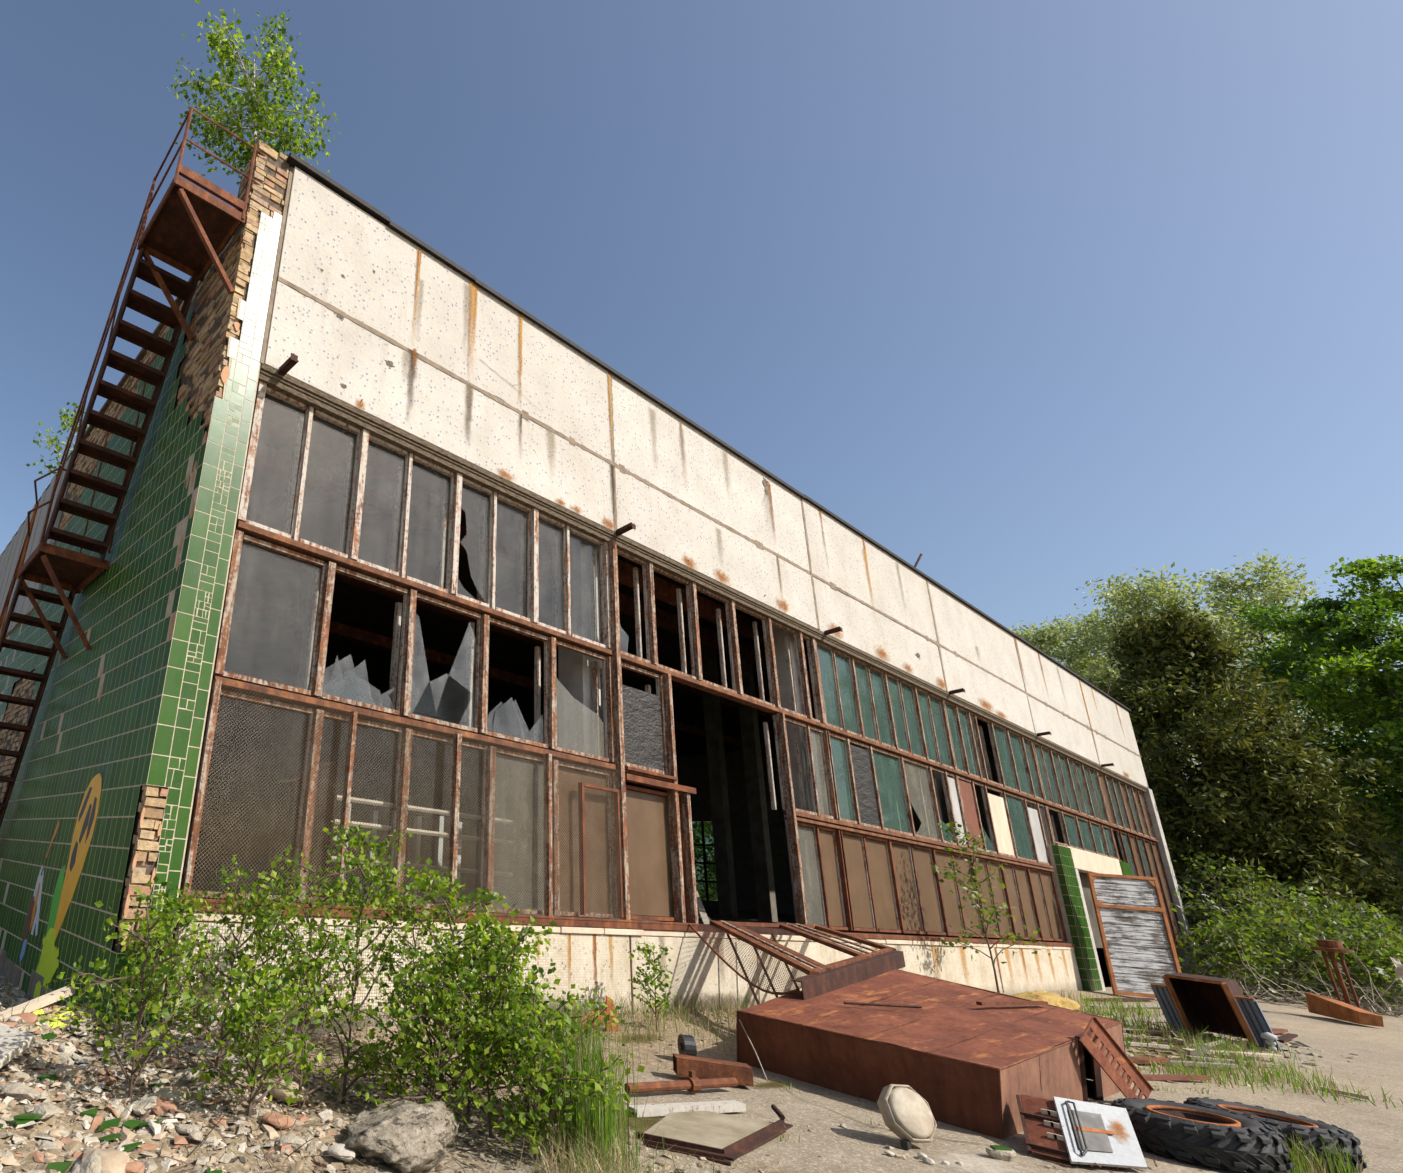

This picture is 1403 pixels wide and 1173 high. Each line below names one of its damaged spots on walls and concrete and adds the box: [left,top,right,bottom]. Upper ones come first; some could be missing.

spalling [177,140,289,445]
corrosion [415,249,423,305]
corrosion [466,280,478,341]
spalling [59,325,170,530]
peeling [176,461,197,571]
spalling [118,785,169,946]
corrosion [593,934,613,983]